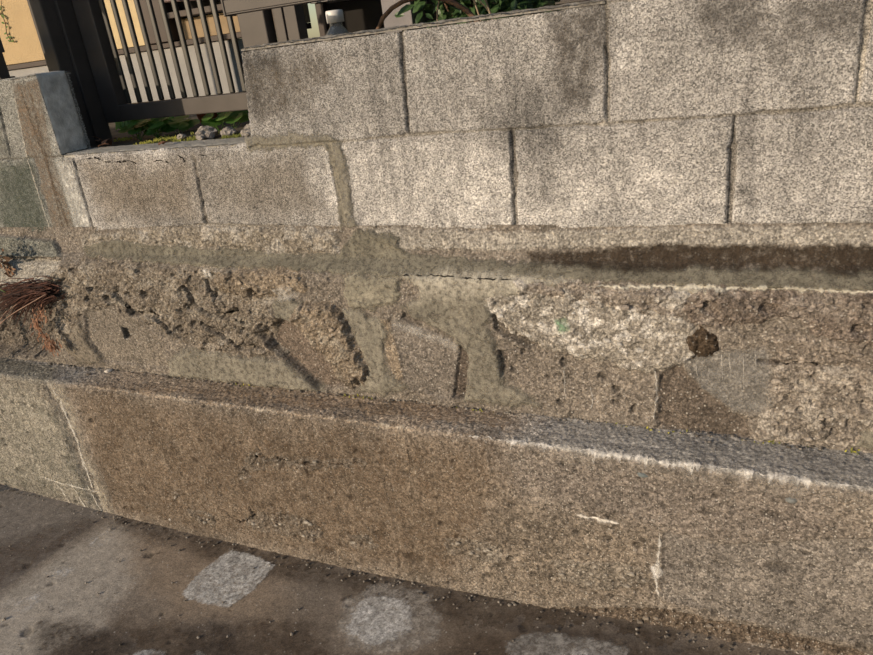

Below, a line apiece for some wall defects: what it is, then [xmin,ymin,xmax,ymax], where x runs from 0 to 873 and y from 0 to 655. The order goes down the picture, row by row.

crack [388,273,515,281]